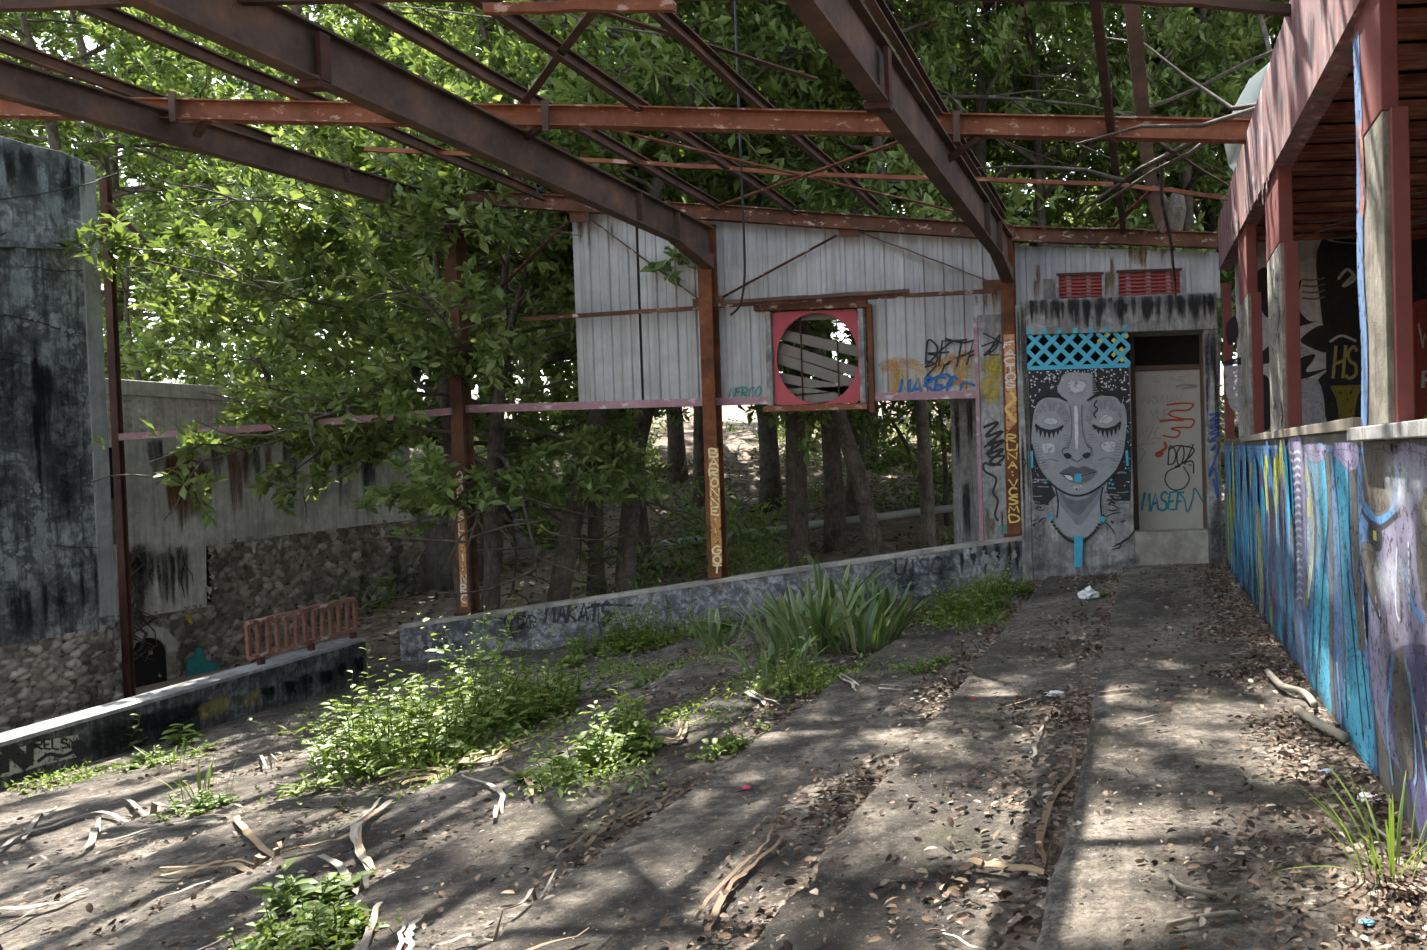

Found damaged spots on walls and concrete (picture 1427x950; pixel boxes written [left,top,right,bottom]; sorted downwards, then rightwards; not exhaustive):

leakage [0,344,79,505]